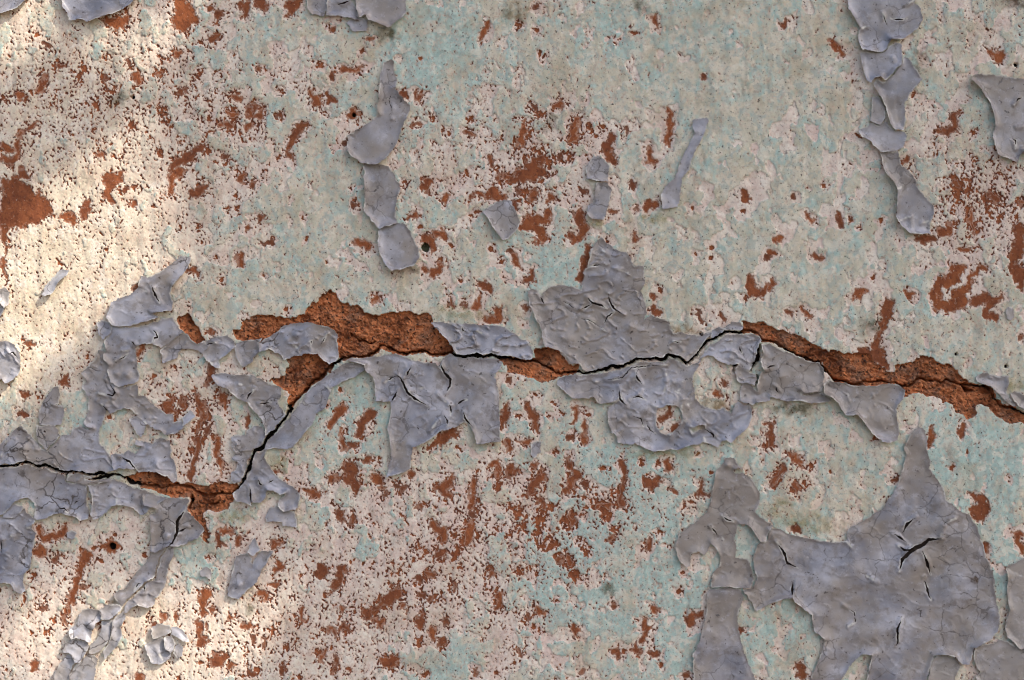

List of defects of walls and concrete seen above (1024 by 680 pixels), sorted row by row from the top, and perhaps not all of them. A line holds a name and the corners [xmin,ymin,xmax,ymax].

peeling [283,0,406,42]
peeling [341,59,451,278]
peeling [469,154,558,246]
peeling [567,132,618,245]
peeling [634,117,709,213]
peeling [847,0,953,246]
peeling [971,49,1024,162]
crack [452,352,522,360]
crack [568,330,838,384]
crack [0,461,142,485]
crack [239,396,302,488]
peeling [0,235,1024,680]